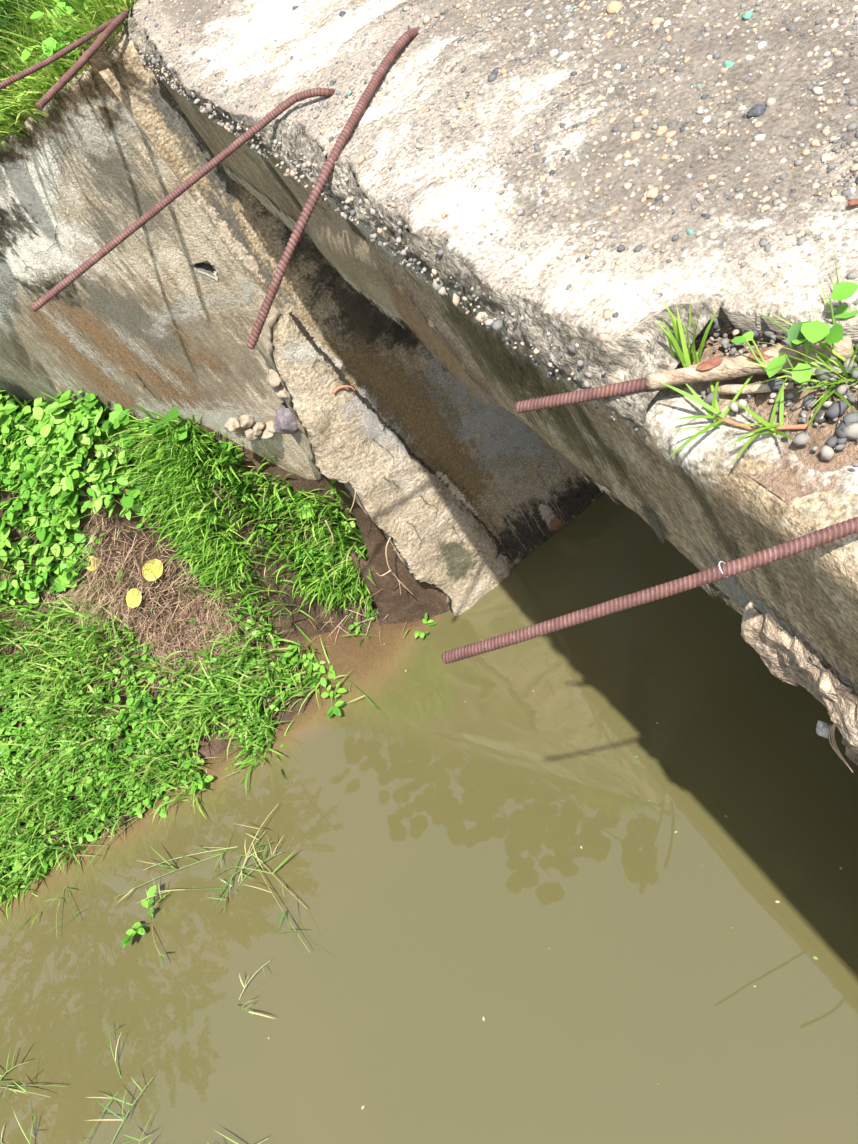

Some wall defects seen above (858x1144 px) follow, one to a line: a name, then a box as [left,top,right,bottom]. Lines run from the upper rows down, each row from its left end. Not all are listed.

damp [0,82,668,566]
spalling [0,4,720,430]
crack [288,312,517,567]
spalling [538,504,559,529]
spalling [441,517,858,766]
damp [641,385,802,640]
damp [808,466,858,507]